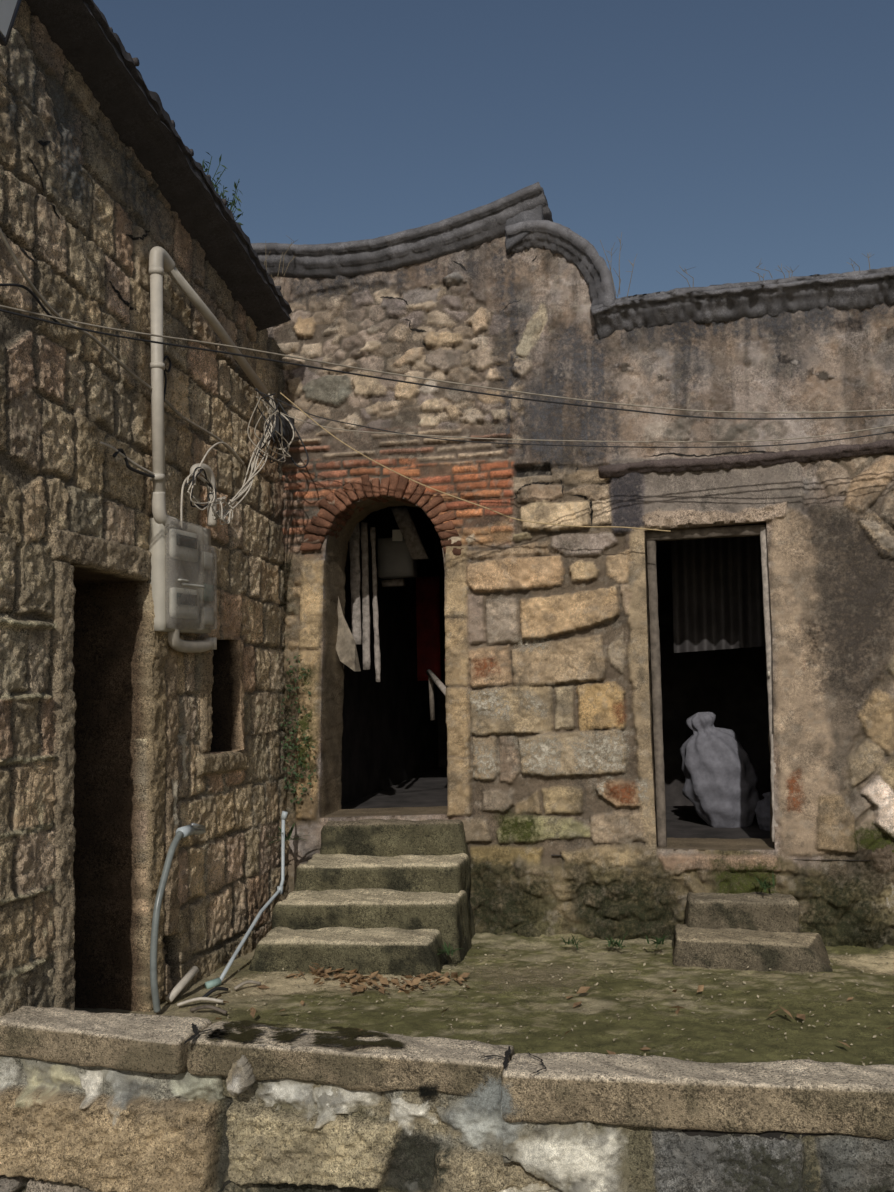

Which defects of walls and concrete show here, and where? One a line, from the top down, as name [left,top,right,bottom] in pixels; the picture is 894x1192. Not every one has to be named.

water stain [389,1136,450,1192]